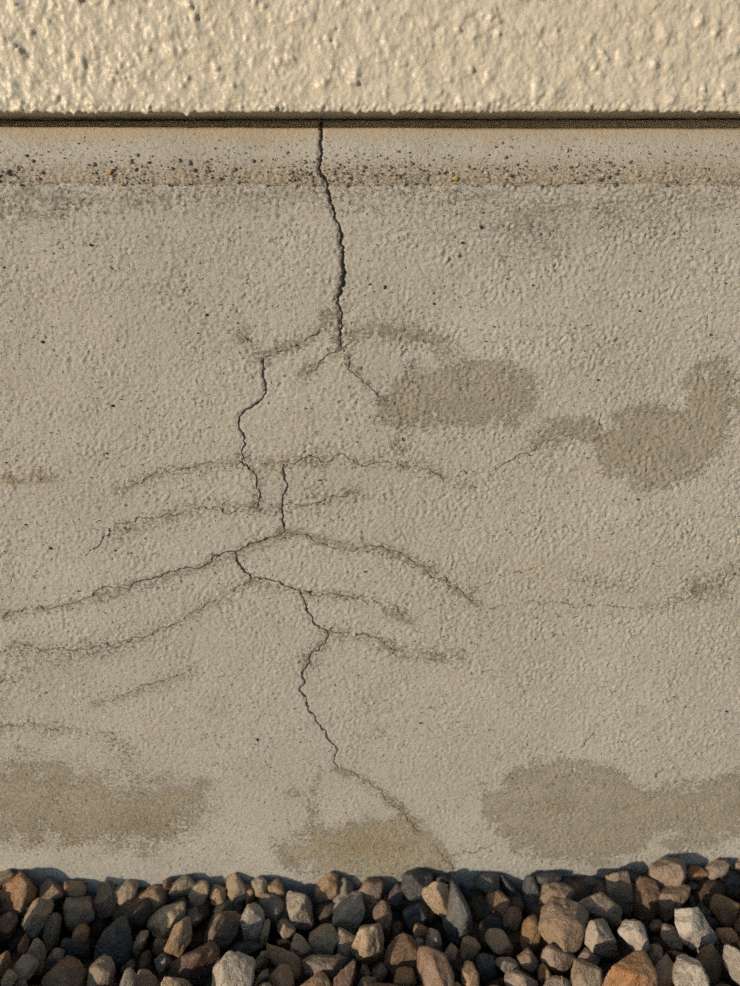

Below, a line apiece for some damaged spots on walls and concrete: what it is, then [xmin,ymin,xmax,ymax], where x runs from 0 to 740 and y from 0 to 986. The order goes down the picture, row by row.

damp [109,447,366,542]
crack [0,119,535,870]
damp [232,301,542,492]
crack [490,431,574,475]
damp [521,352,740,493]
damp [0,574,416,686]
damp [1,528,483,622]
damp [296,624,465,668]
crack [527,600,643,610]
damp [0,731,220,860]
damp [476,756,740,867]